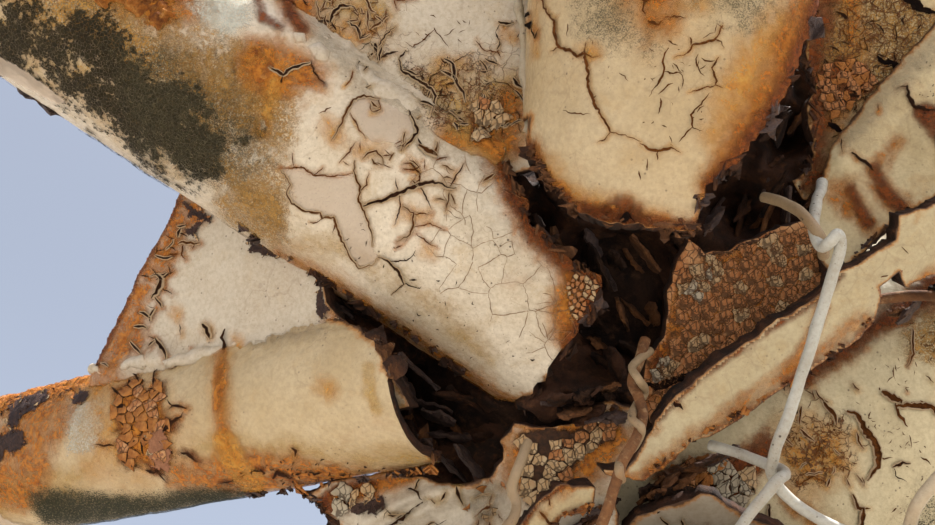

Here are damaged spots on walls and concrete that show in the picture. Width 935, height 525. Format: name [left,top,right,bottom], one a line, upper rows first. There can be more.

corrosion [0,195,203,509]
water stain [97,240,159,364]
water stain [2,0,307,243]
crack [95,224,226,483]
peeling [179,201,212,241]
corrosion [168,357,522,503]
peeling [317,480,386,519]
peeling [513,110,821,507]
corrosion [442,0,935,432]
corrosion [695,433,771,487]
crack [785,322,935,525]
crack [817,0,935,170]